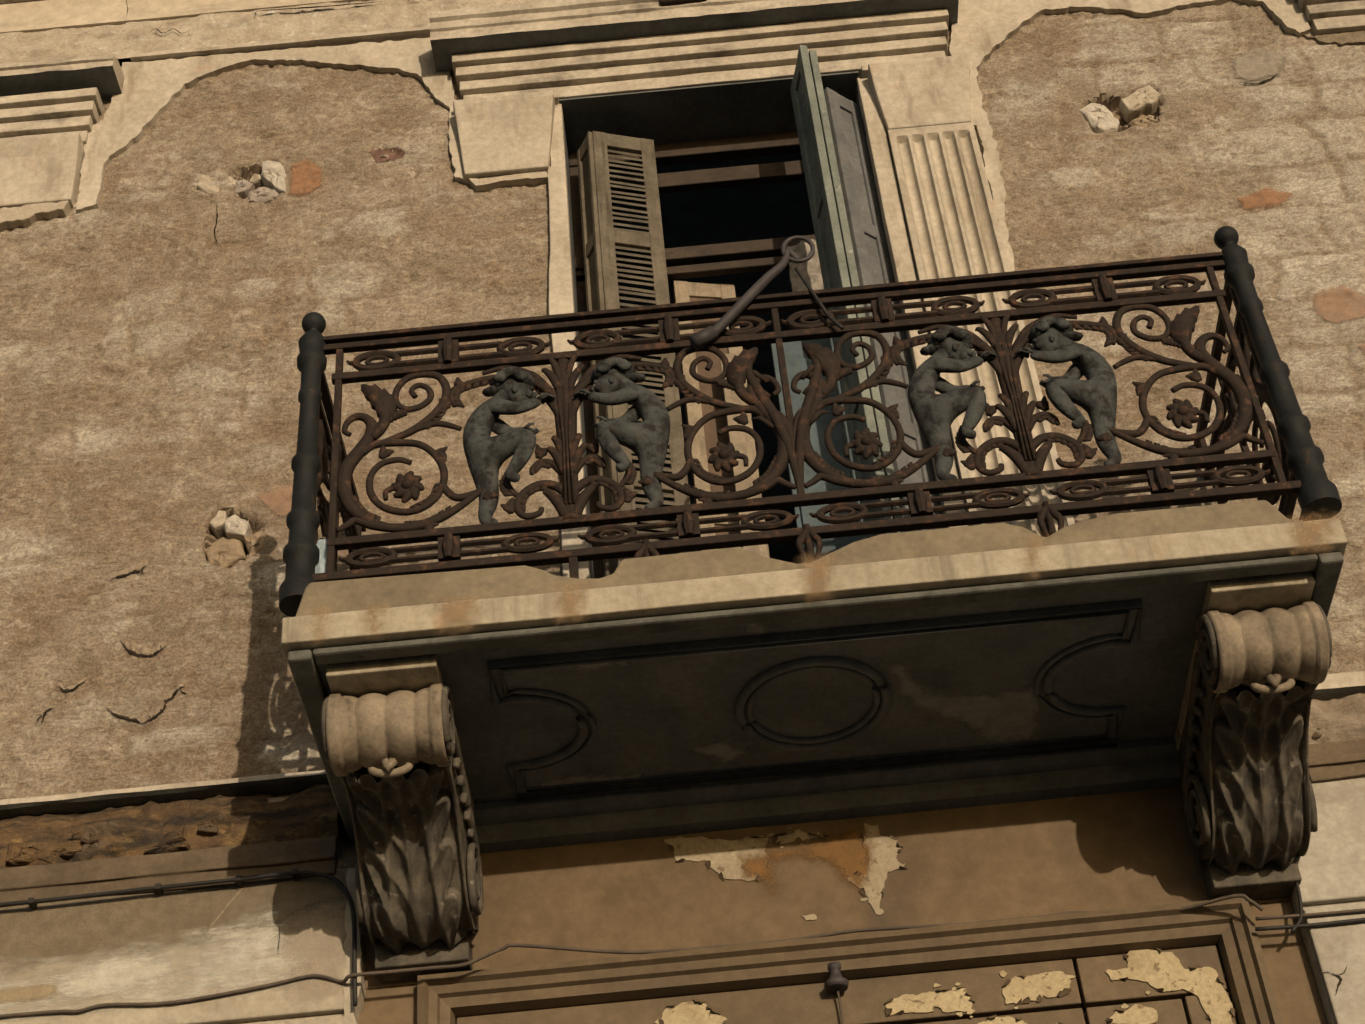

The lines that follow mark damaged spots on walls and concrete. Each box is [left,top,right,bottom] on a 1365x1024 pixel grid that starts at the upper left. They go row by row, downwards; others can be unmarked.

spalling [1079,85,1161,133]
spalling [196,159,322,204]
spalling [469,171,549,192]
spalling [203,507,265,568]
crack [120,636,168,657]
crack [35,677,87,725]
crack [106,679,187,723]
spalling [143,821,218,855]
peeling [664,827,830,882]
peeling [848,823,908,915]
peeling [884,970,1076,1024]
peeling [1105,948,1236,1024]